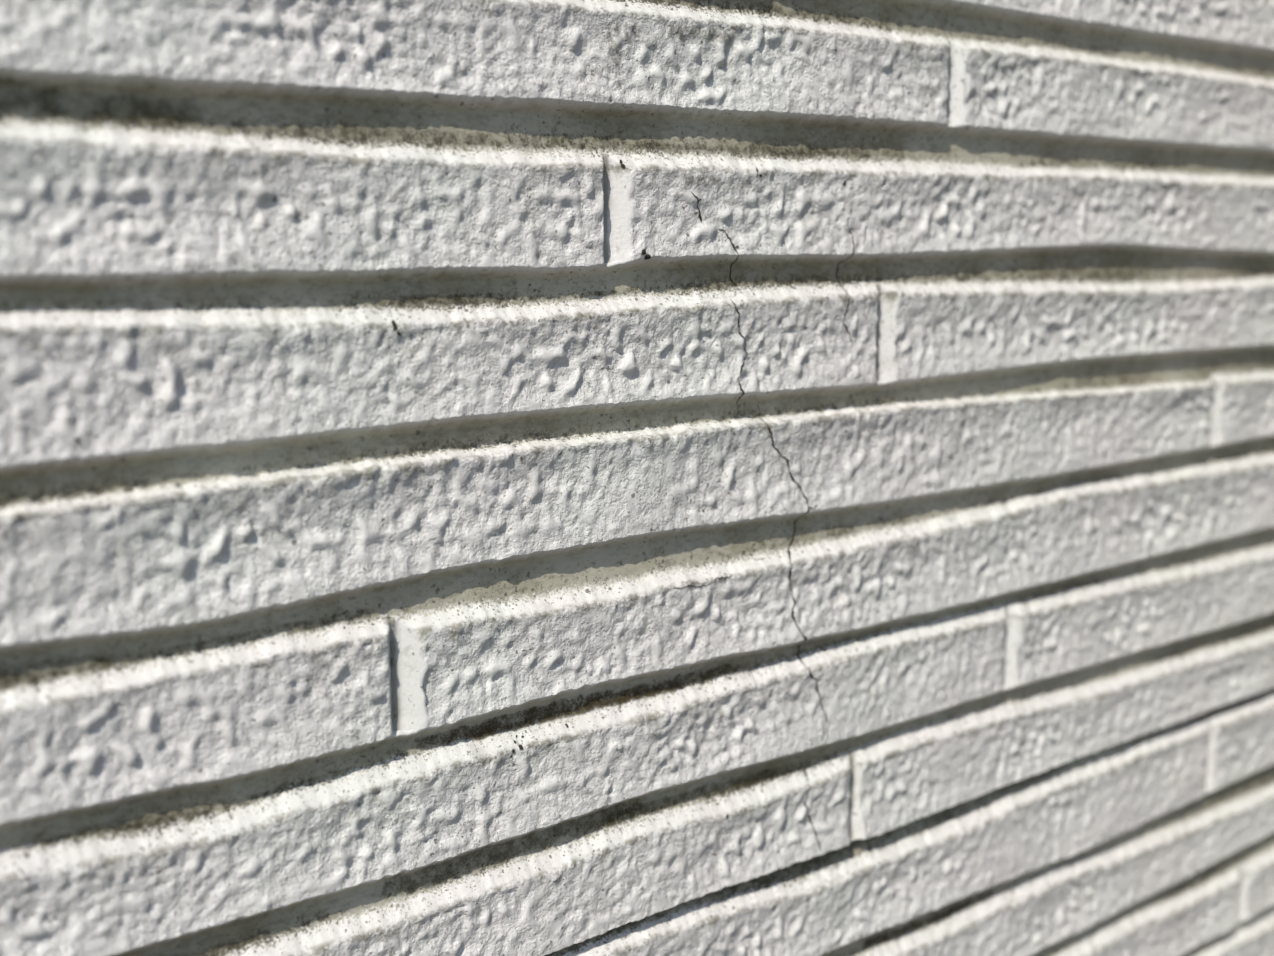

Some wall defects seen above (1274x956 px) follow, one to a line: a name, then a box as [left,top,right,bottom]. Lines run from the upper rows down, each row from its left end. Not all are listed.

crack [836,210,855,346]
crack [691,192,828,739]
crack [670,574,733,590]
crack [803,765,821,851]